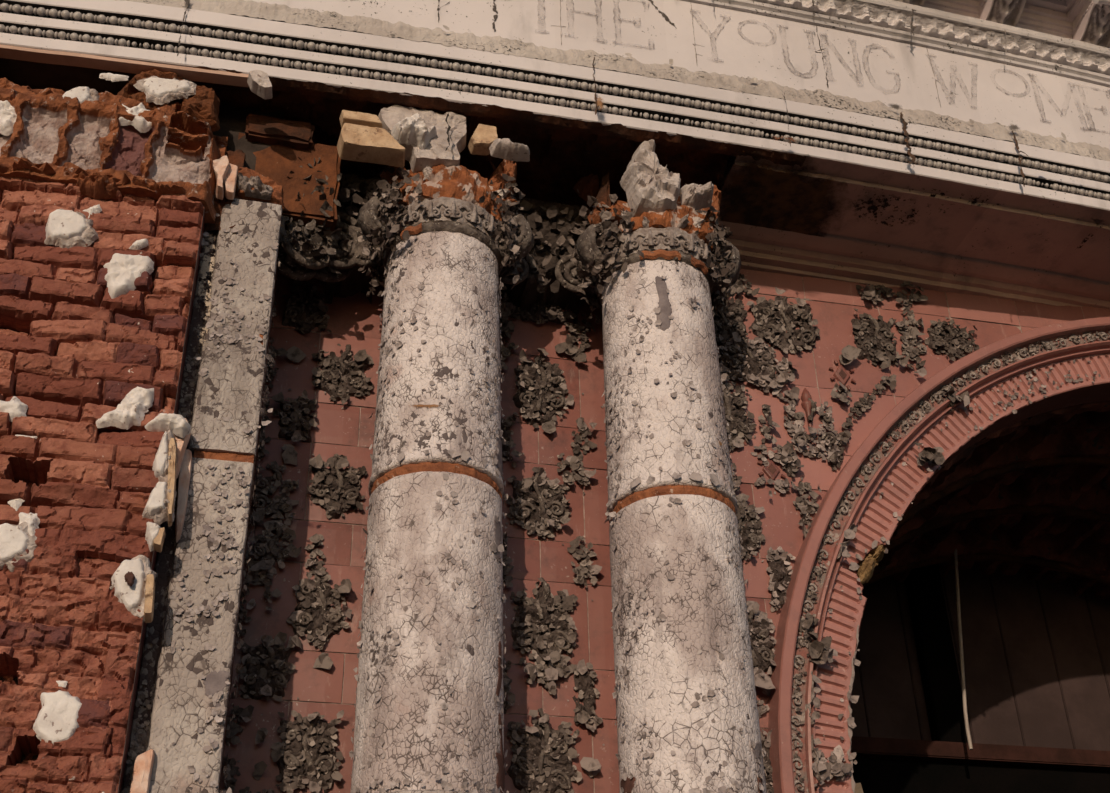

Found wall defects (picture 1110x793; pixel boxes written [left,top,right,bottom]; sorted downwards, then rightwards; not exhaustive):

crack [900,111,917,164]
spalling [0,78,980,793]
peeling [791,331,1110,793]